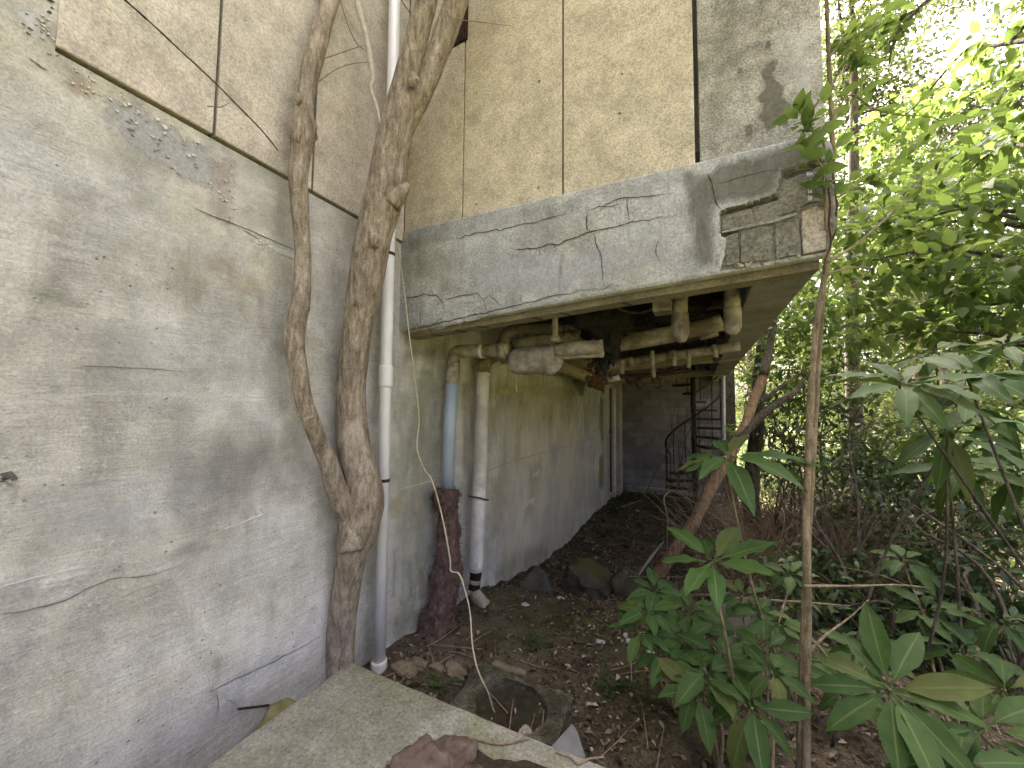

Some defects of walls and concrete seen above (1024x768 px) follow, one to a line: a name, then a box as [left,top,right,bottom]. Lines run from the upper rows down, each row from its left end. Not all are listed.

spalling [21,6,56,41]
water stain [746,60,791,135]
crack [195,208,294,250]
crack [406,193,673,330]
spalling [722,172,829,268]
crack [89,365,185,373]
crack [0,565,182,615]
crack [208,632,326,723]